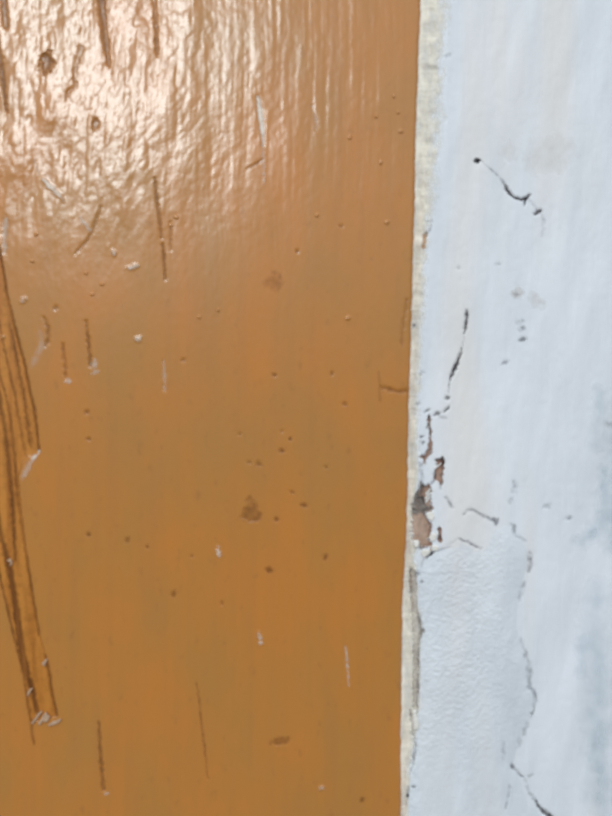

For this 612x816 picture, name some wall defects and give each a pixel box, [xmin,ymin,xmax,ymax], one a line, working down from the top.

crack [503,182,541,215]
crack [427,353,461,415]
flaking render [411,416,445,557]
flaking render [409,569,424,731]